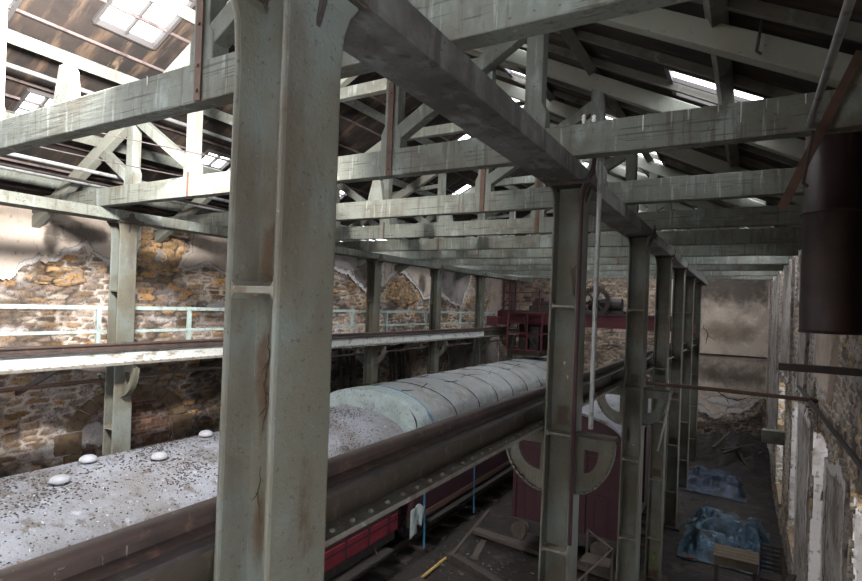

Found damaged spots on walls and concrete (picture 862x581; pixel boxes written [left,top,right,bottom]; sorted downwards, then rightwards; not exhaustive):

peeling [0,205,111,287]
leakage [45,222,108,250]
peeling [136,227,228,275]
peeling [334,255,368,292]
peeling [381,262,473,308]
peeling [485,278,503,315]
crack [259,334,270,431]
peeling [697,250,862,581]